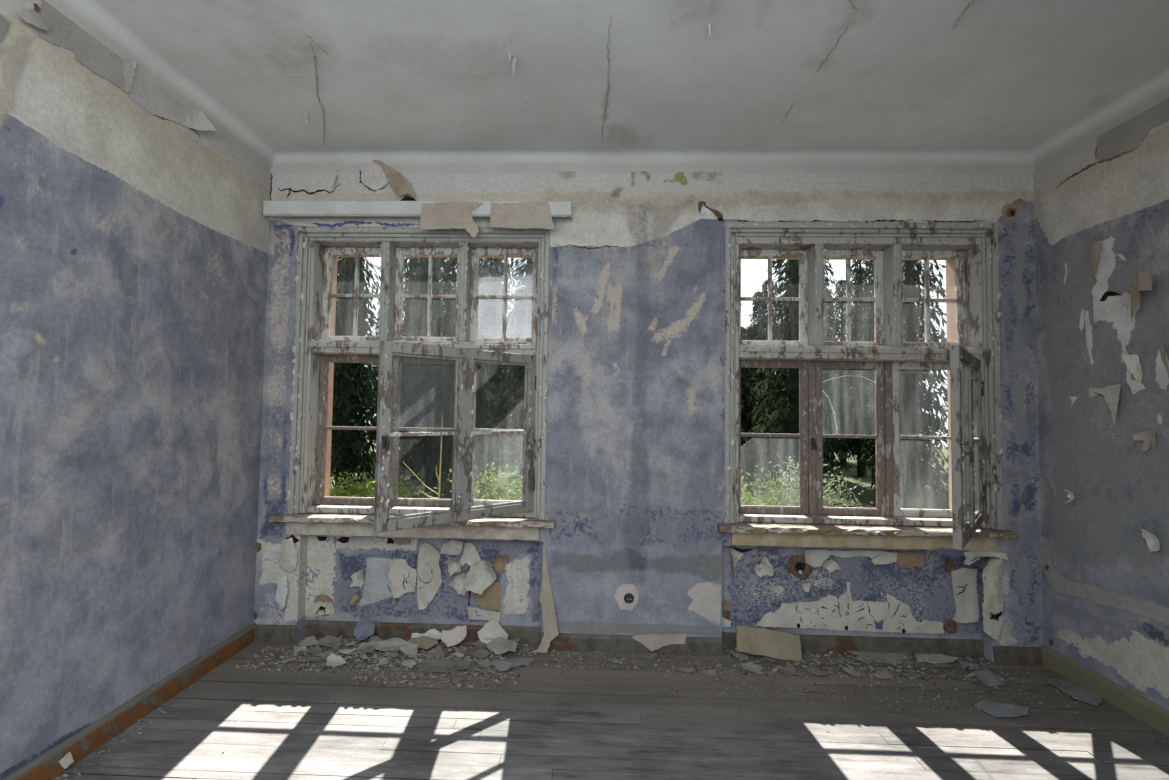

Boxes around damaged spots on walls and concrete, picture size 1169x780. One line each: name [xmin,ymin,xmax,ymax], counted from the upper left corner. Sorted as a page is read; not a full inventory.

crack [816,0,857,73]
crack [305,34,329,144]
crack [270,170,340,200]
crack [312,219,419,227]
peeling [1079,236,1169,395]
peeling [287,227,549,543]
peeling [698,197,1008,535]
spalling [273,535,299,610]
peeling [349,538,411,606]
peeling [440,539,508,610]
peeling [733,547,925,594]
spalling [939,548,1018,646]